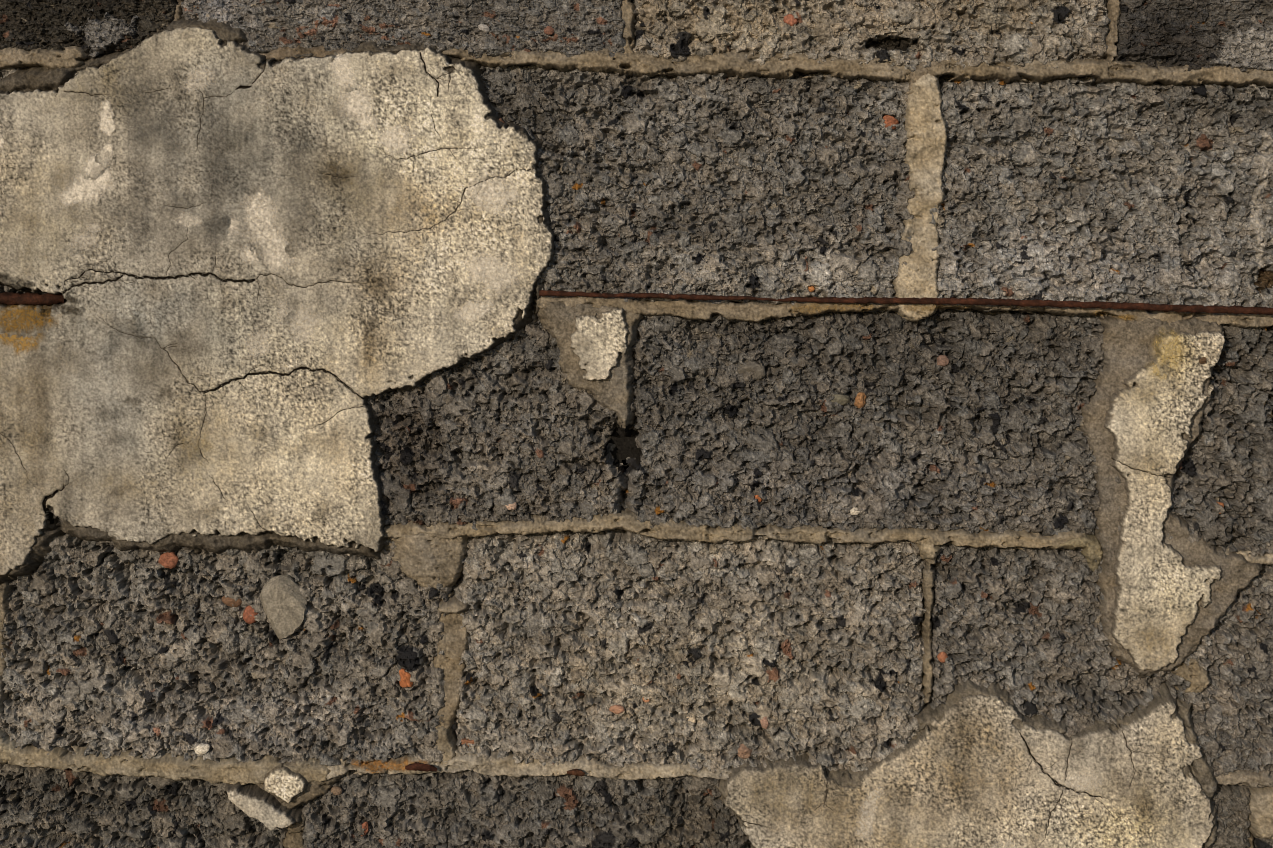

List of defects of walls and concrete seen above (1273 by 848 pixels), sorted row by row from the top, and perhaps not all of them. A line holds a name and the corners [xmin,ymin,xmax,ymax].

spalling [865,35,926,51]
crack [380,52,476,160]
corrosion [0,292,66,353]
crack [62,203,380,304]
corrosion [539,290,1273,320]
spalling [1254,269,1273,293]
crack [98,316,368,531]
spalling [603,422,643,472]
crack [39,470,69,524]
peeling [226,763,308,831]
peeling [405,762,437,772]
crack [1018,724,1149,845]